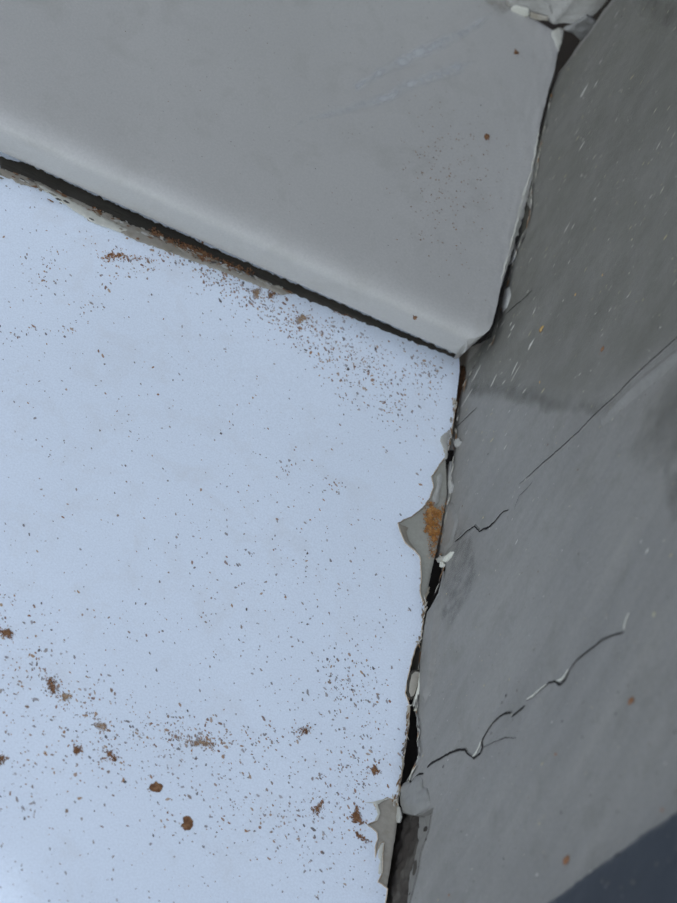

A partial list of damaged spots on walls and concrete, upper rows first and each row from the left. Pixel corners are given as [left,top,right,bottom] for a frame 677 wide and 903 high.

peeling [504,123,547,293]
crack [455,337,677,542]
corrosion [418,496,447,558]
spalling [366,307,502,903]
crack [408,613,629,783]